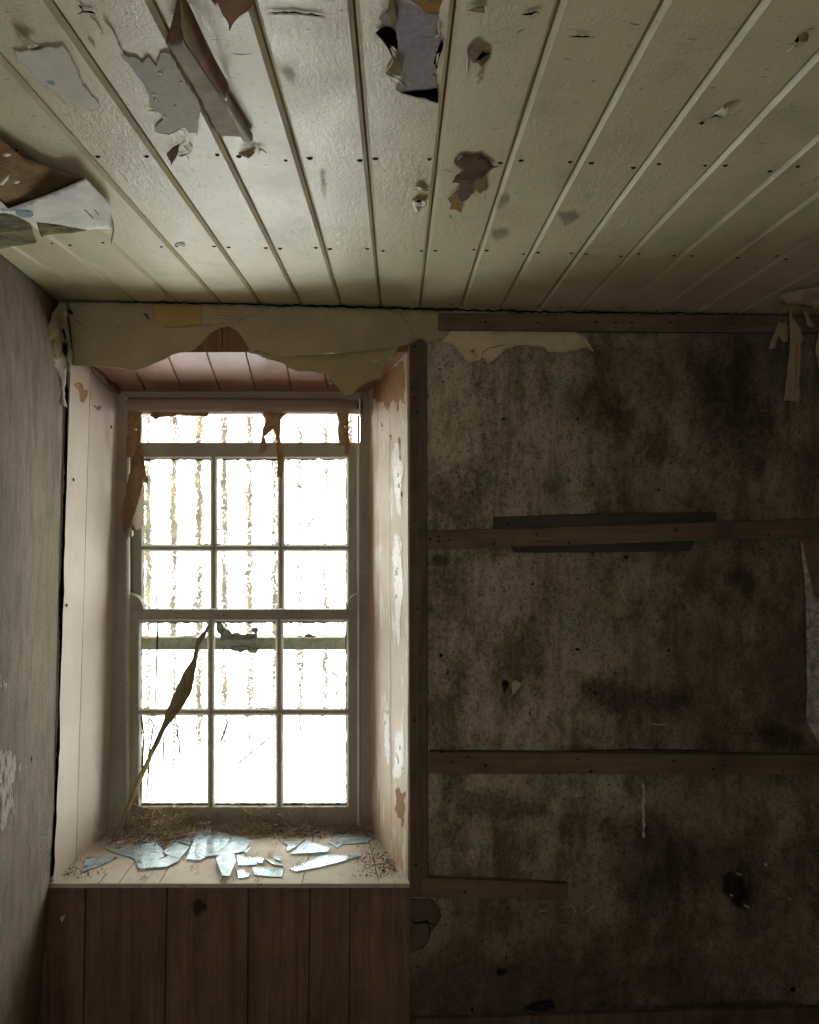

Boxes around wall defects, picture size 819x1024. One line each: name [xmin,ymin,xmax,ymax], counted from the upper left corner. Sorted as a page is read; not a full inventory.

peeling [14,28,100,110]
peeling [120,0,267,165]
peeling [445,154,499,218]
peeling [373,360,406,411]
peeling [777,286,819,402]
peeling [381,423,404,516]
peeling [392,534,405,647]
peeling [383,692,406,825]